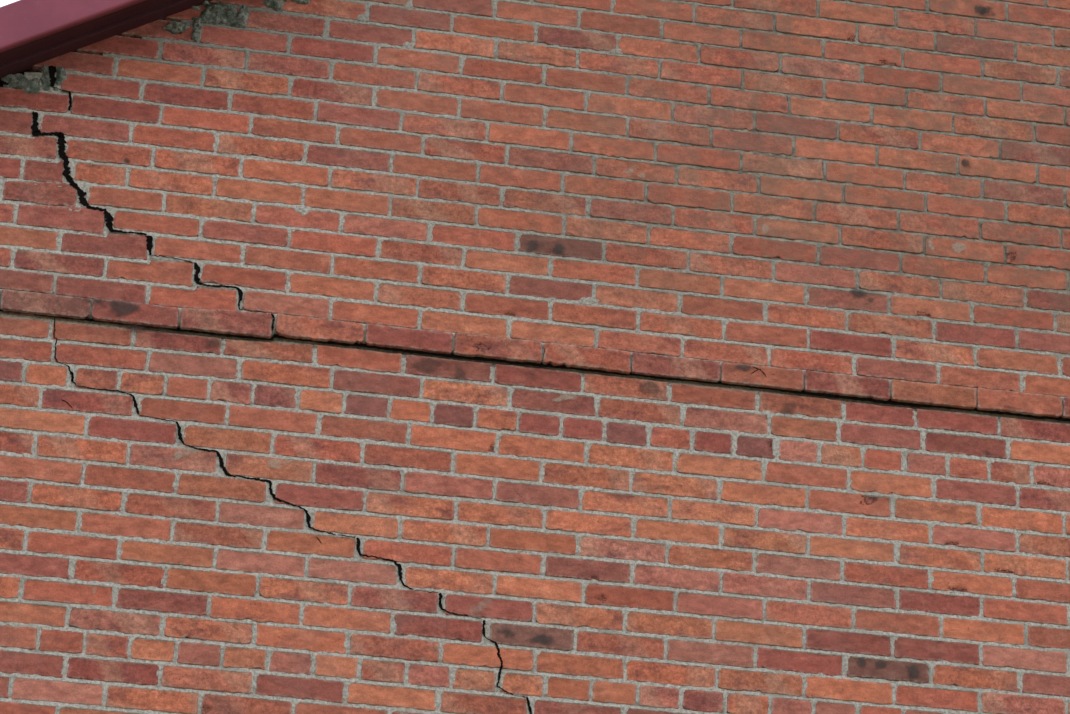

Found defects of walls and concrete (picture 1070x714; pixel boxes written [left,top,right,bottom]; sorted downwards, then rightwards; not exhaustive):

crack [48,66,72,111]
crack [0,111,1070,590]
crack [420,590,532,714]